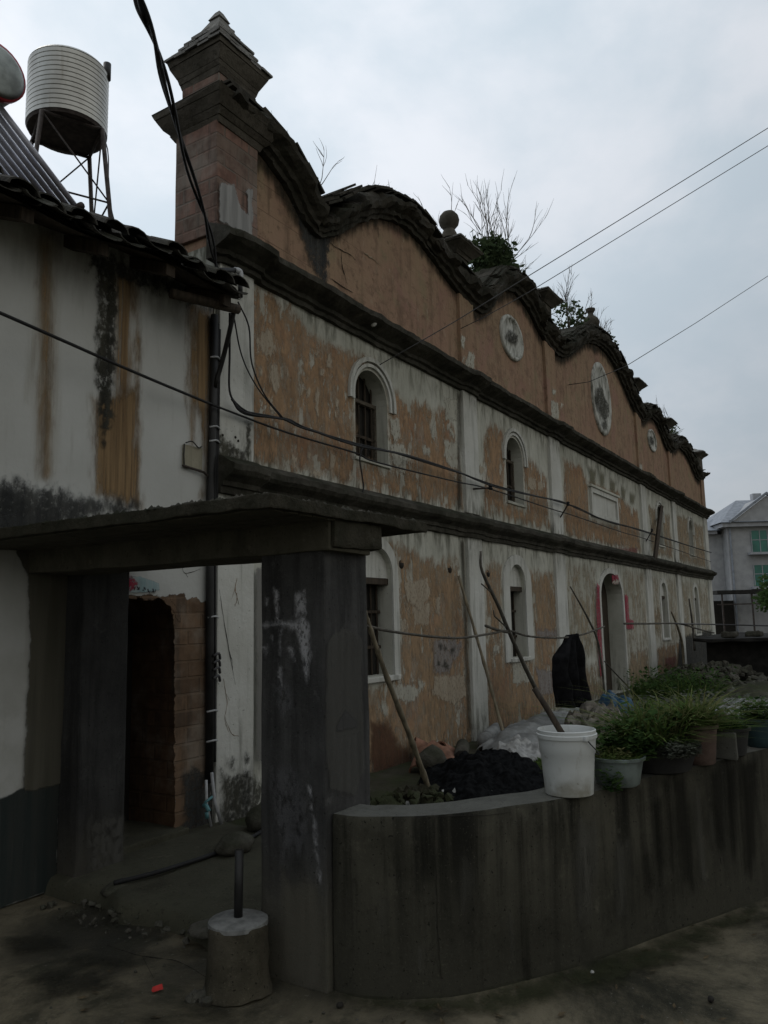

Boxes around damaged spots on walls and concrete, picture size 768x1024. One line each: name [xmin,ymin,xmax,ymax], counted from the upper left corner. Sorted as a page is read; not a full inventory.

crack [329,236,380,293]
mould [89,253,191,447]
peeling [461,335,475,369]
corrosion [96,275,141,505]
peeling [390,417,408,474]
peeling [422,398,458,468]
water stain [0,477,139,528]
spalling [129,593,209,828]
crack [219,581,239,736]
peeling [392,673,466,707]
peeling [513,662,553,695]
mould [182,755,261,829]